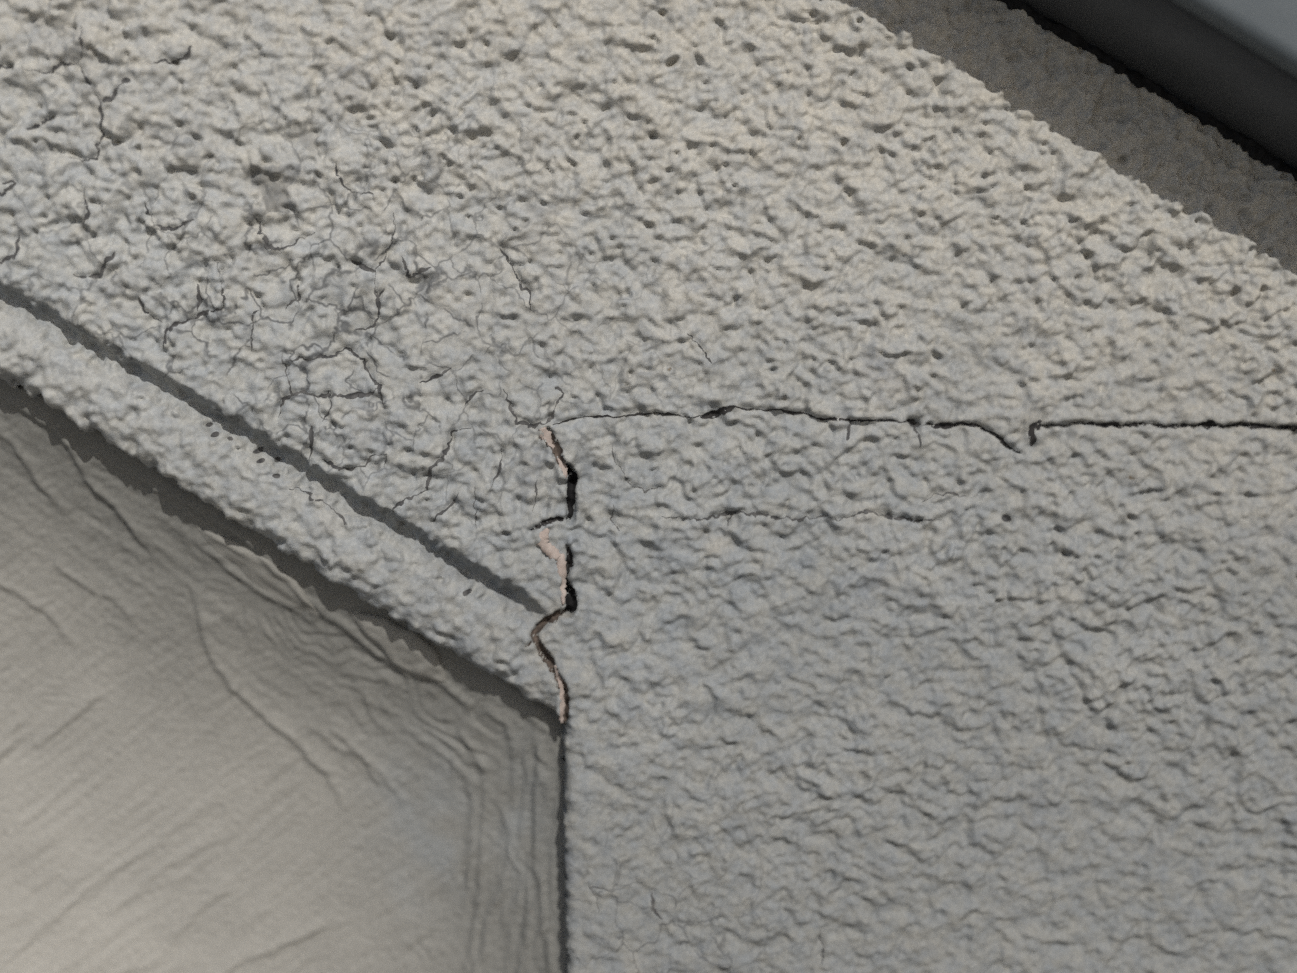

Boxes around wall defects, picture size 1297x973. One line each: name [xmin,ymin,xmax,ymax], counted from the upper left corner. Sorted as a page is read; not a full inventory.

crack [155,45,192,64]
crack [0,25,120,224]
crack [144,201,194,231]
crack [0,234,20,264]
crack [73,251,115,278]
crack [255,218,315,250]
crack [500,249,531,310]
crack [138,263,301,351]
crack [279,164,431,524]
crack [420,368,450,383]
crack [392,386,1297,724]